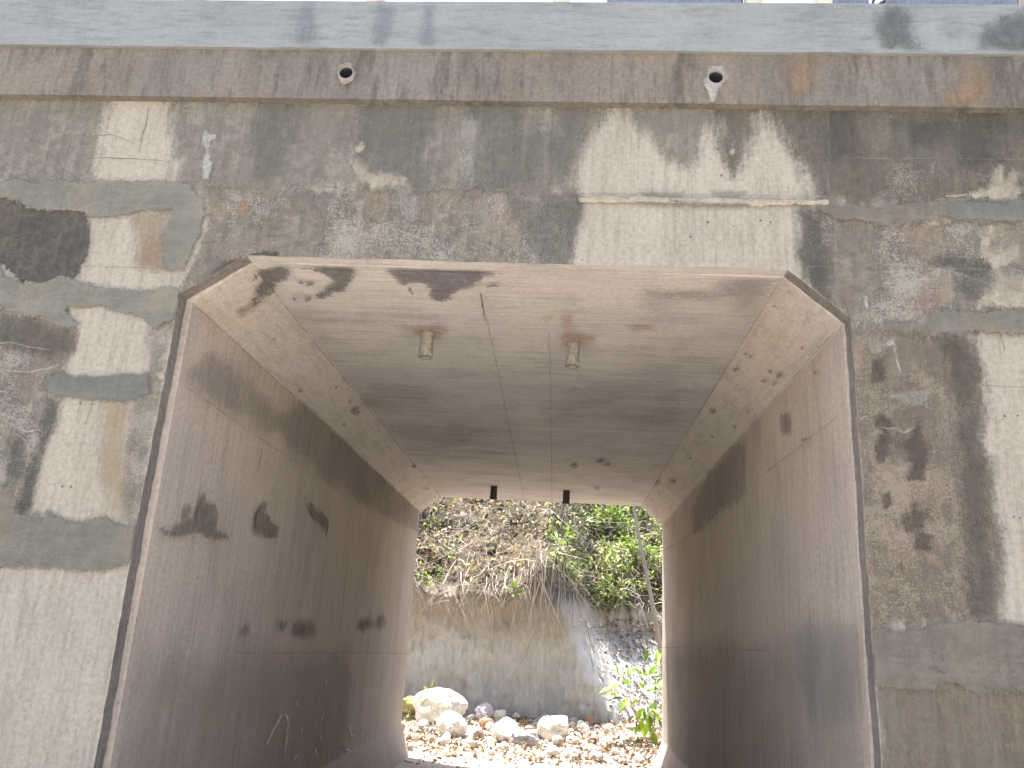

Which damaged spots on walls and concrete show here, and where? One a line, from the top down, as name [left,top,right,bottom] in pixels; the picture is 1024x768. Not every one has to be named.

leakage [171,102,607,306]
leakage [631,66,1024,632]
leakage [161,494,229,540]
leakage [255,502,279,539]